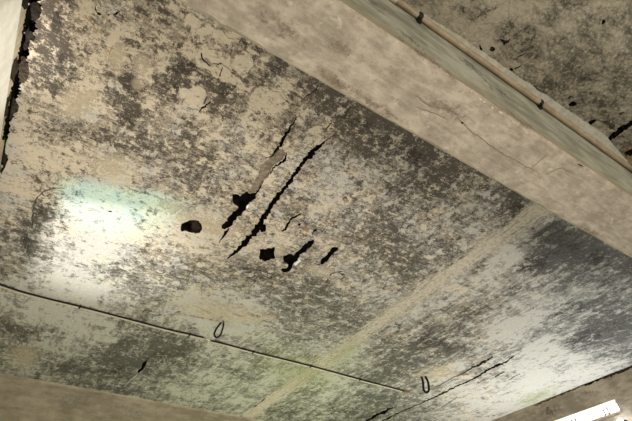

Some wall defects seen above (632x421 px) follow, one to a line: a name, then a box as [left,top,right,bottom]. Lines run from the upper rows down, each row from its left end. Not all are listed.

peeling [21,0,42,21]
peeling [10,27,36,83]
peeling [4,93,19,119]
crack [219,116,336,259]
spalling [180,220,202,234]
spalling [259,247,275,261]
crack [124,357,150,387]
crack [366,356,519,421]